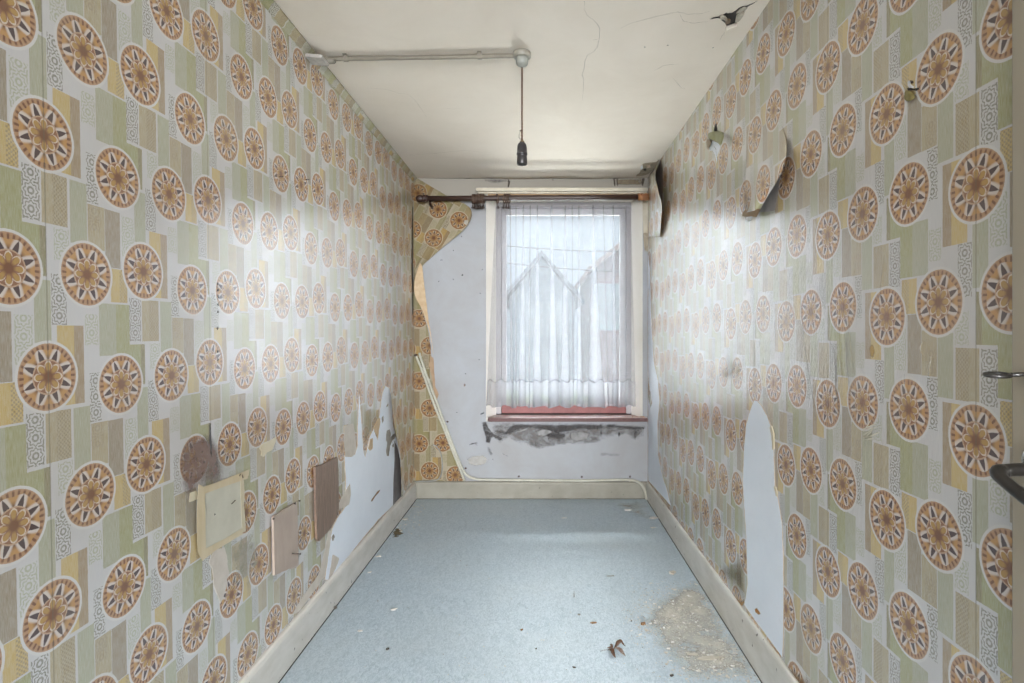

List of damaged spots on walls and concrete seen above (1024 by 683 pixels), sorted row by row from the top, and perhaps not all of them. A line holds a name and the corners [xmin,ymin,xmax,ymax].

flaking render [726,7,747,33]
flaking render [759,163,785,212]
leakage [470,422,640,465]
peeling [324,386,402,580]
peeling [742,401,784,657]